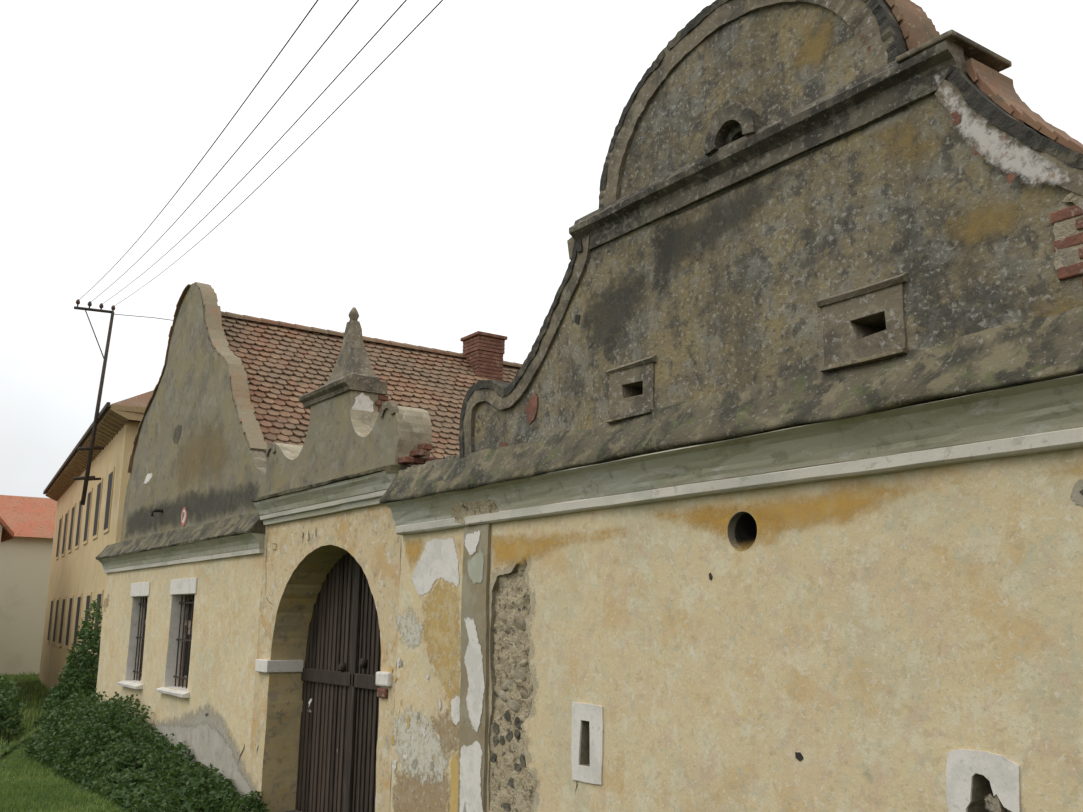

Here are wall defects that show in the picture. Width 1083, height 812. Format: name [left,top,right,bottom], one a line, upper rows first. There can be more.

peeling [934,75,1083,288]
peeling [1071,479,1083,507]
flaking render [412,530,540,812]
peeling [383,699,434,772]
flaking render [986,795,1024,812]